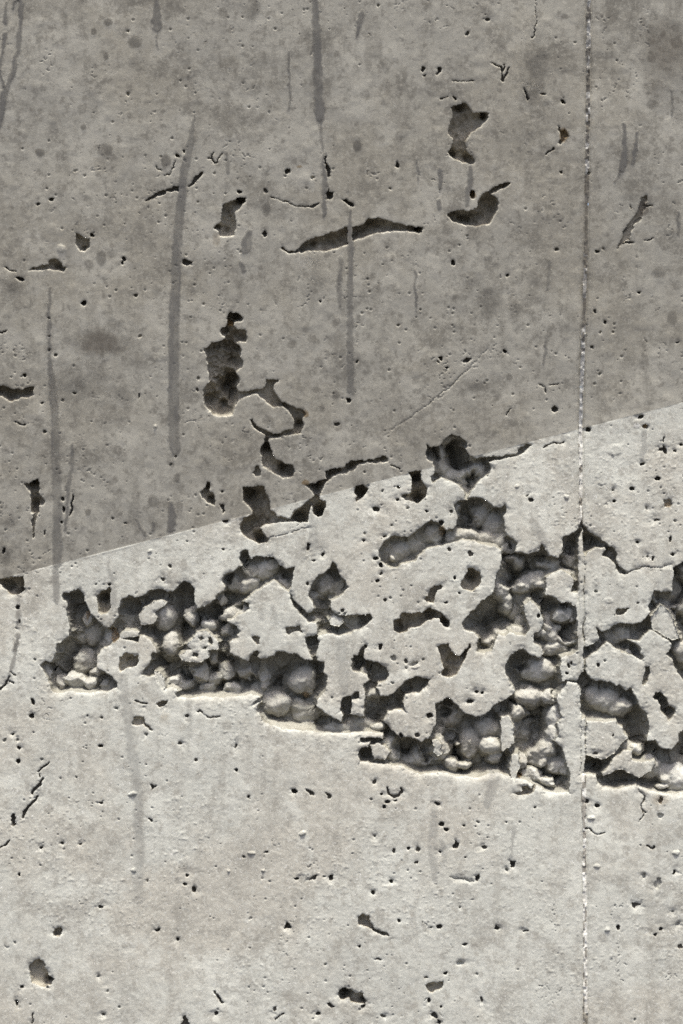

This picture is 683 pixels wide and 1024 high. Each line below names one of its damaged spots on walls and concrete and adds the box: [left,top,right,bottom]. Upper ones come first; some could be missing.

water stain [313,0,322,71]
water stain [315,98,325,122]
hole [448,103,489,164]
hole [447,182,511,227]
spalling [281,217,423,253]
water stain [168,236,181,389]
hole [203,312,247,417]
water stain [168,502,176,532]
spalling [240,442,388,544]
hole [404,470,427,503]
hole [393,585,450,633]
hole [438,643,471,678]